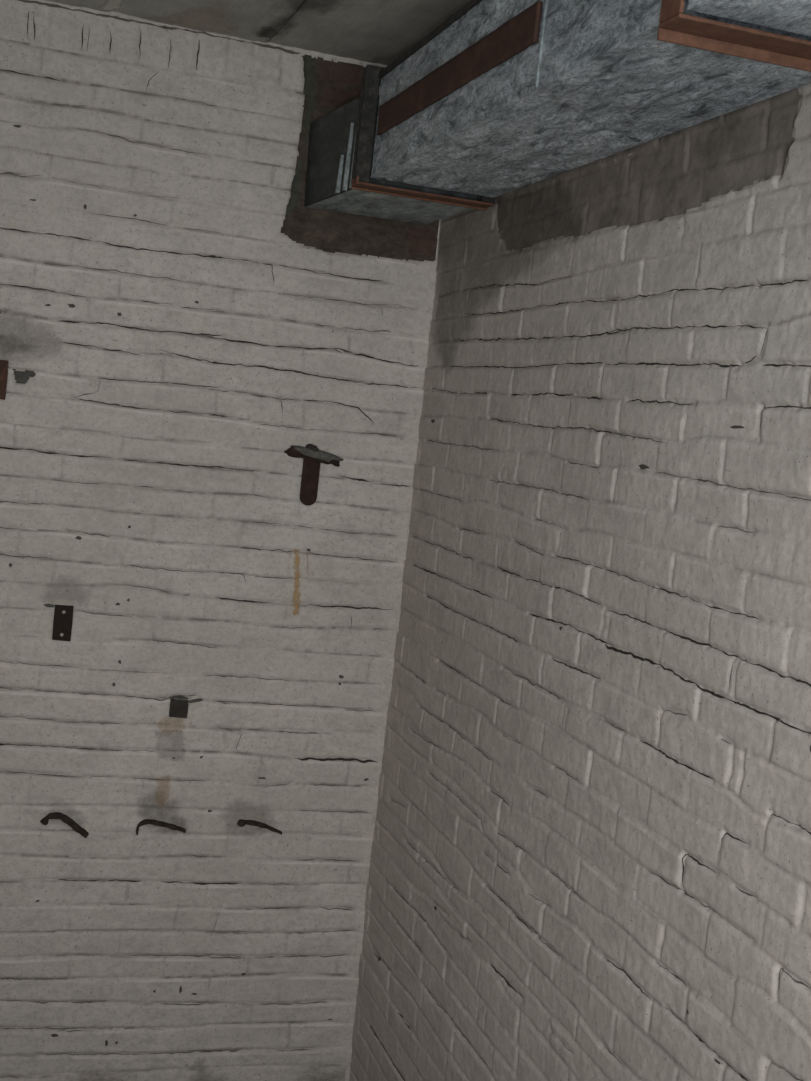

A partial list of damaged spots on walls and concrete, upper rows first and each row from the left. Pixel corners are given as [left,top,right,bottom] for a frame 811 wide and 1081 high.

flaking render [281,54,439,262]